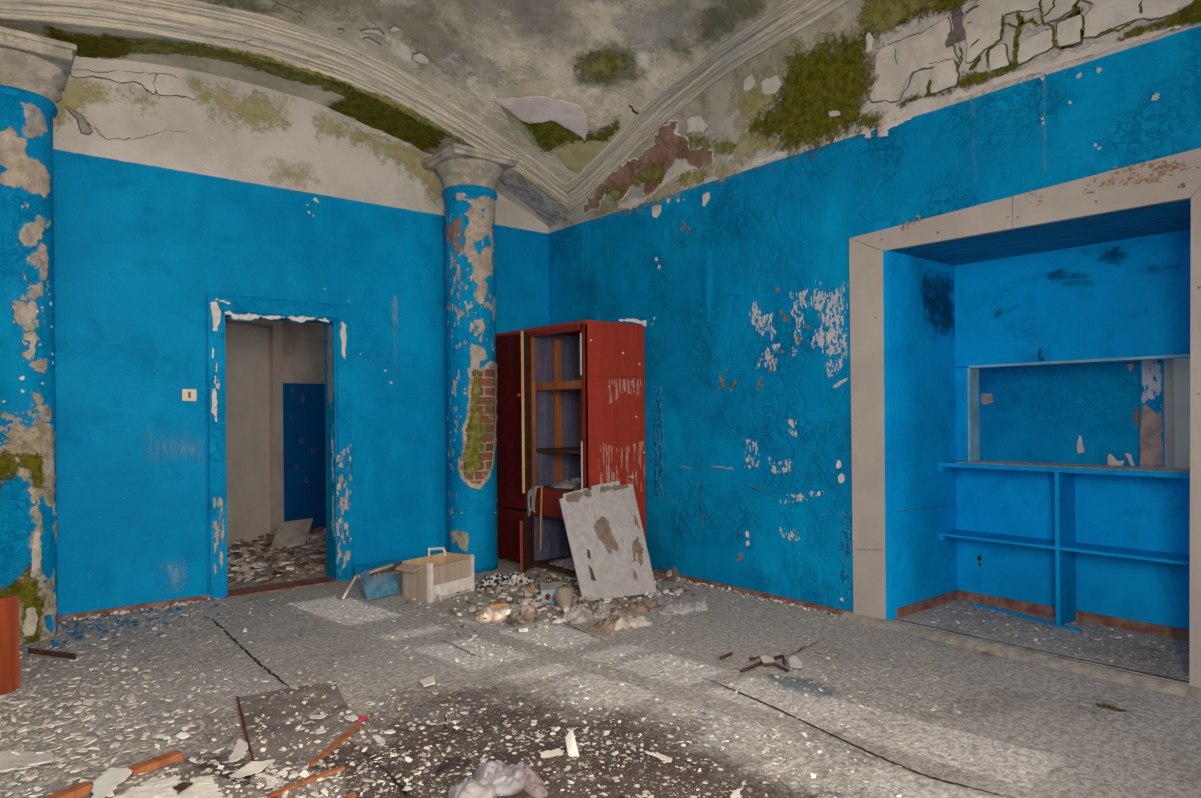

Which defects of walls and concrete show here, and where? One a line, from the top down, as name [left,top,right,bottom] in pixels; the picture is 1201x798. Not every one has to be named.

spalling [0,101,58,645]
peeling [55,97,93,135]